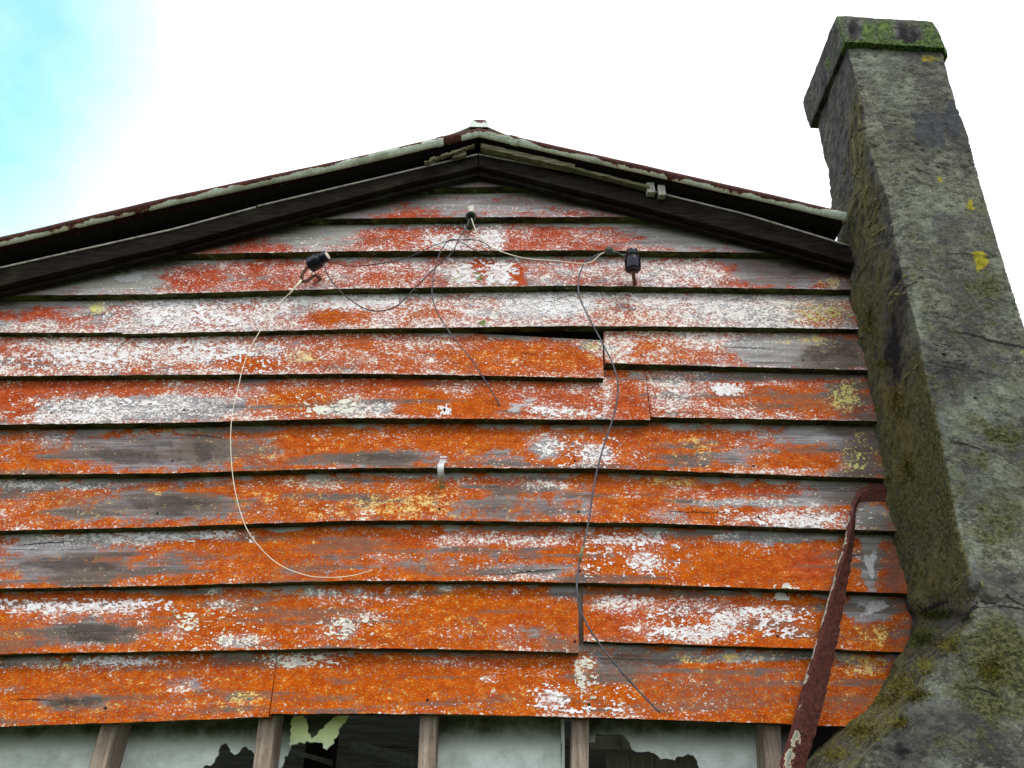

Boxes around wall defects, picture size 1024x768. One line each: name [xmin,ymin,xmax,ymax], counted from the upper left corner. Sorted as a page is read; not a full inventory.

peeling [420,223,744,319]
peeling [0,294,422,374]
peeling [296,393,366,418]
peeling [711,383,744,396]
peeling [530,437,620,468]
peeling [22,528,255,543]
peeling [580,531,680,577]
peeling [717,509,873,529]
peeling [0,598,392,668]
peeling [646,583,815,644]
rust [778,484,887,768]
peeling [527,651,635,718]